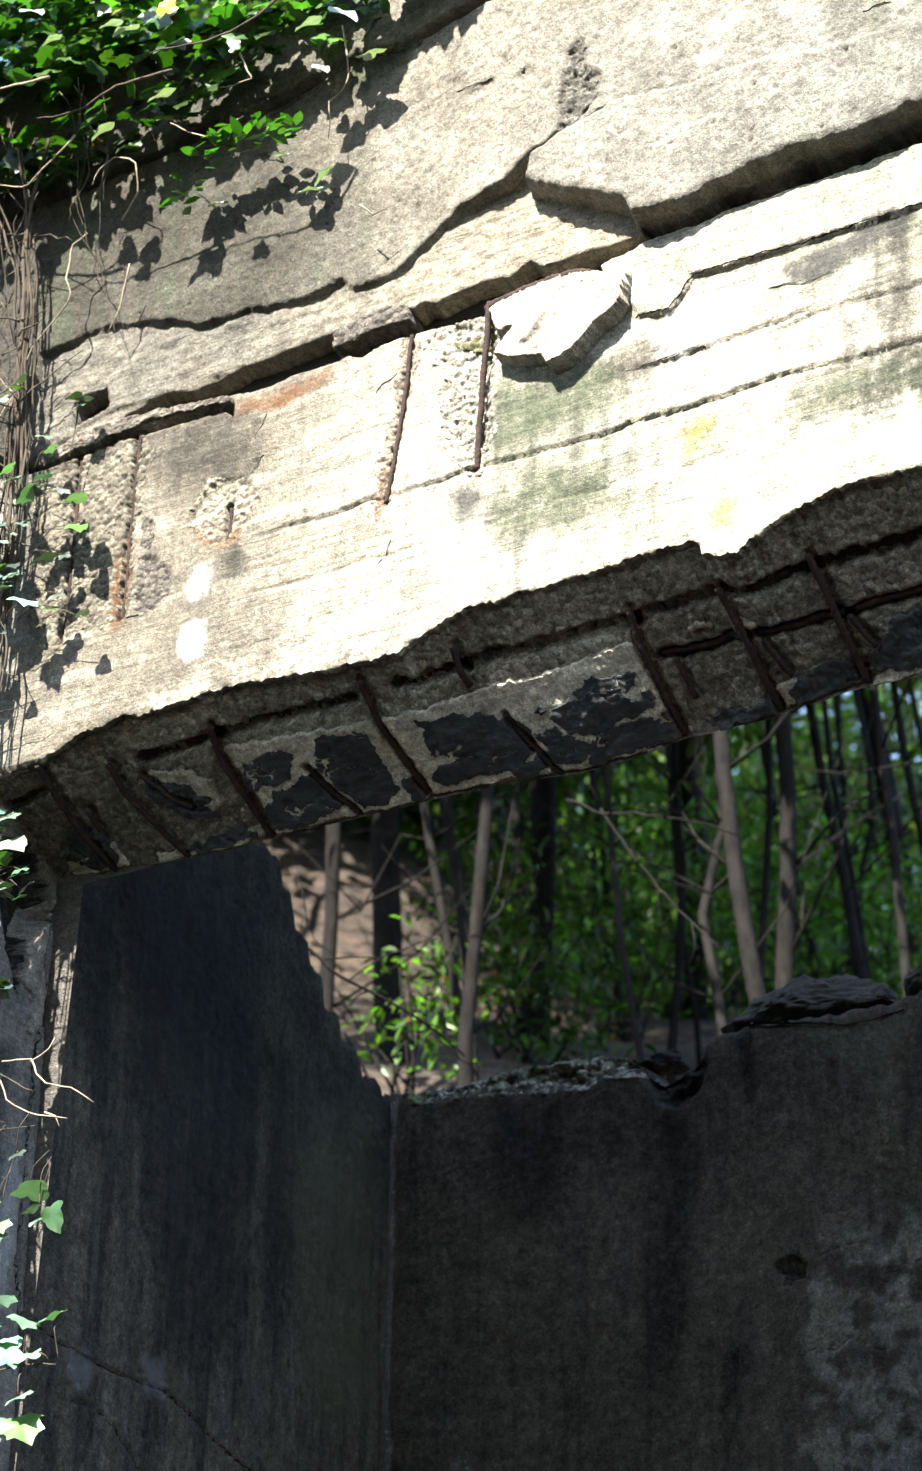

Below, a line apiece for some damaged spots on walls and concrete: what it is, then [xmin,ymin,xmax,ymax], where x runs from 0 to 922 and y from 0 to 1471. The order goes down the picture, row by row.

crack [555,40,613,132]
crack [424,268,603,332]
crack [635,203,922,318]
crack [626,346,711,371]
crack [89,403,110,419]
crack [224,352,397,473]
spalling [29,434,172,653]
spalling [188,477,260,546]
peeling [712,605,922,733]
peeling [145,641,689,855]
peeling [66,828,119,871]
spalling [403,1056,657,1106]